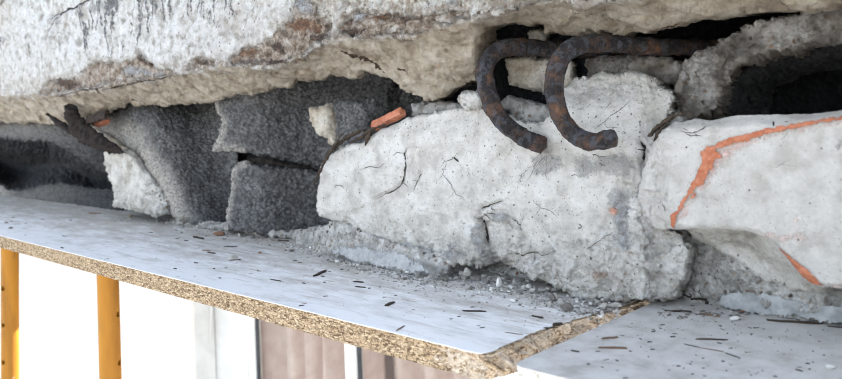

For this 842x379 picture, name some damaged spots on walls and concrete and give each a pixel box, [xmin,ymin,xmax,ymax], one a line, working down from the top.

crack [47,0,89,34]
damp [77,0,123,59]
damp [130,0,234,45]
rust [45,103,126,154]
crack [360,150,462,198]
peeling [670,116,842,228]
crack [477,200,558,243]
spalling [688,229,838,294]